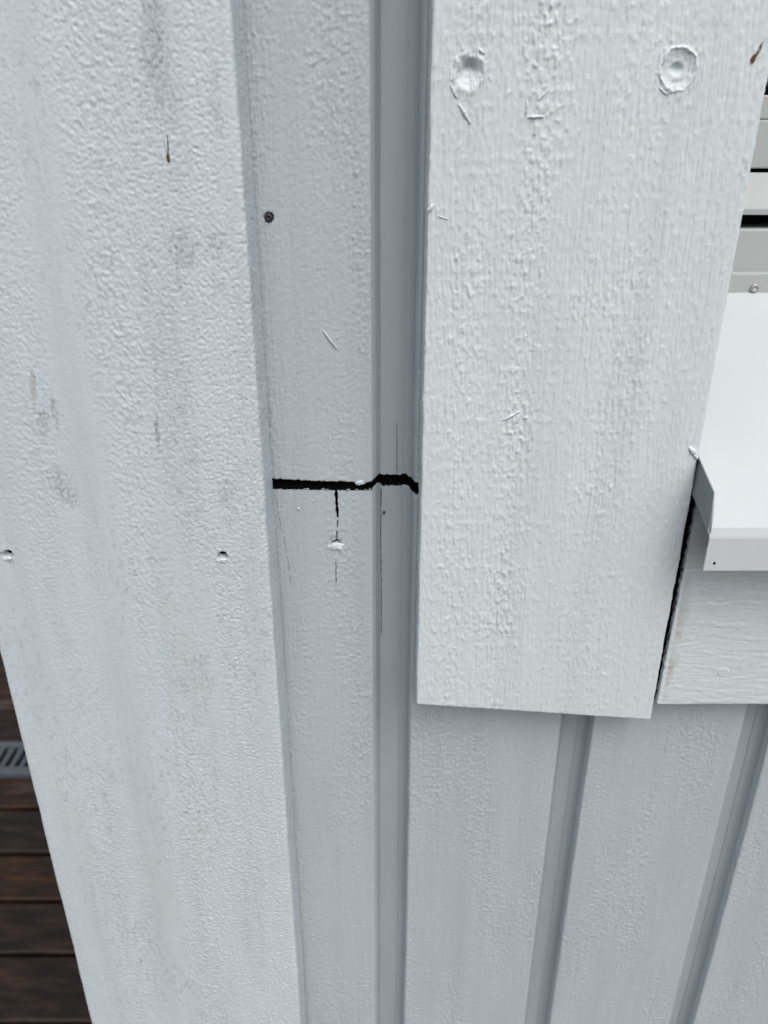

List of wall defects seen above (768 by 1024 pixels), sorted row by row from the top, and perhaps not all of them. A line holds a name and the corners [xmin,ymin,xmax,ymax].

crack [272,465,419,634]